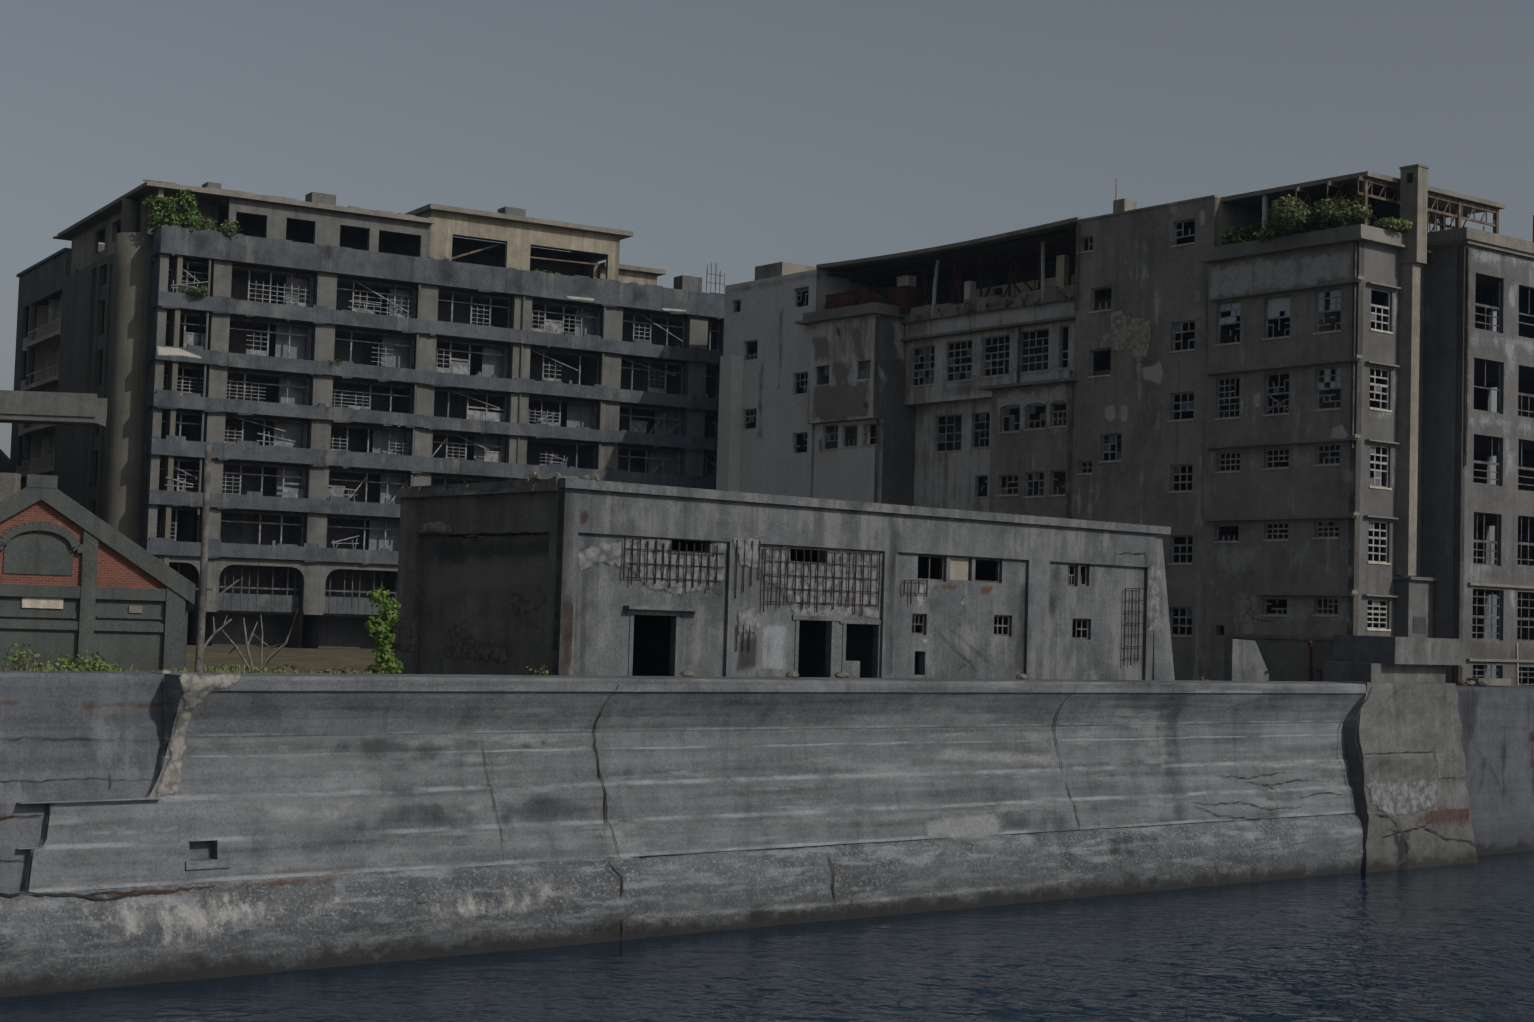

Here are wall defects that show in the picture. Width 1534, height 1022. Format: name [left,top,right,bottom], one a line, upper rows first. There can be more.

flaking render [1098,310,1163,385]
crack [0,736,161,819]
crack [594,685,624,941]
crack [0,860,216,900]
leakage [109,903,144,935]
leakage [159,896,263,943]